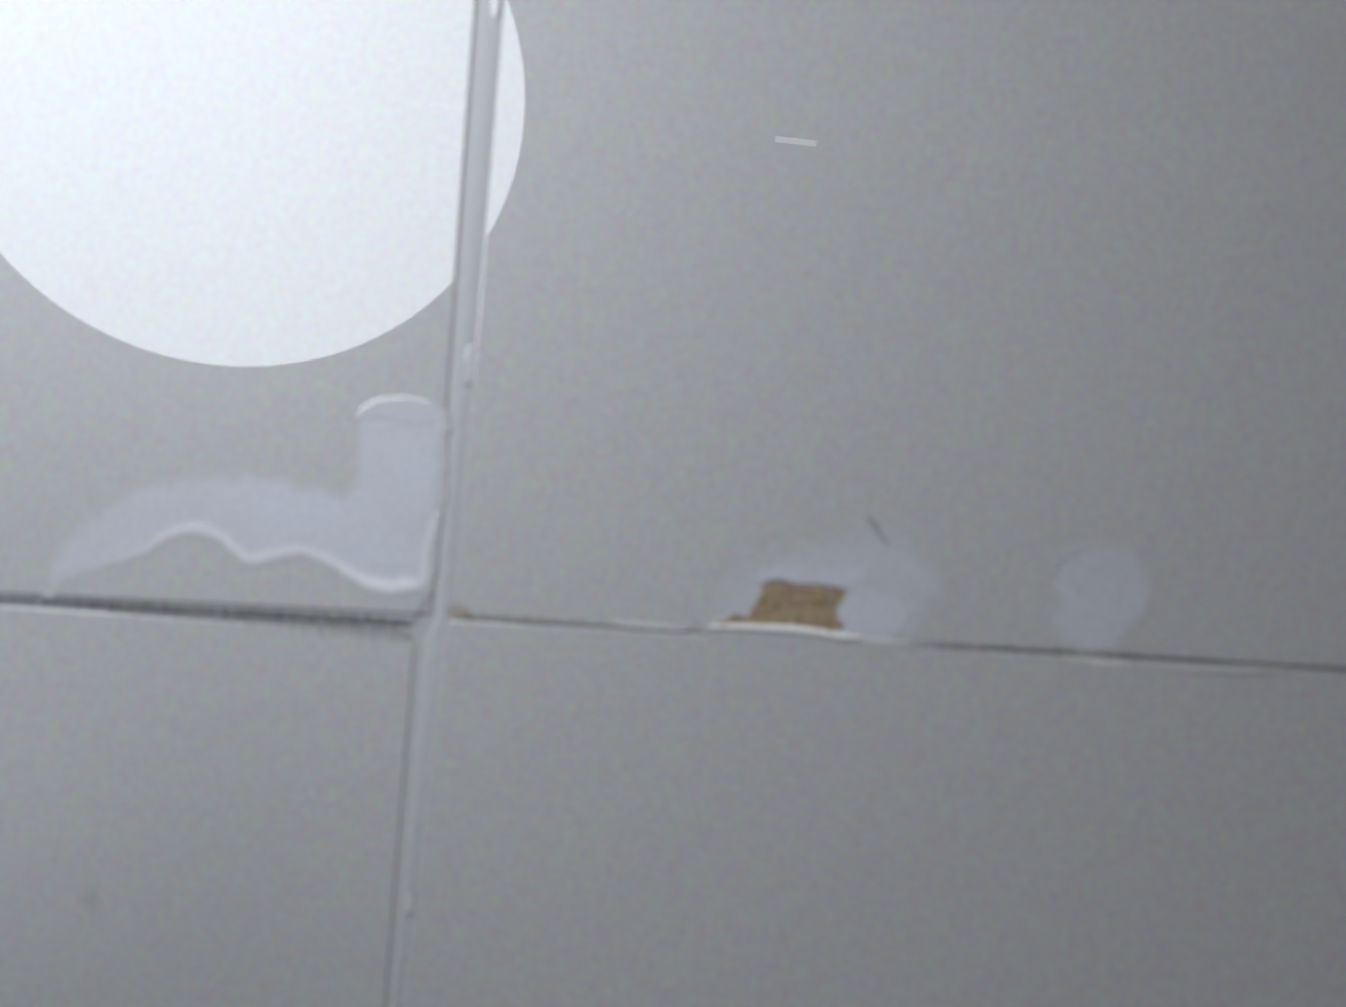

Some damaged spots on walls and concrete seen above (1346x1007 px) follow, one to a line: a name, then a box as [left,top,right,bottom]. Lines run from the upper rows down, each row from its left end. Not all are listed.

spalling [42,395,451,600]
spalling [698,517,980,654]